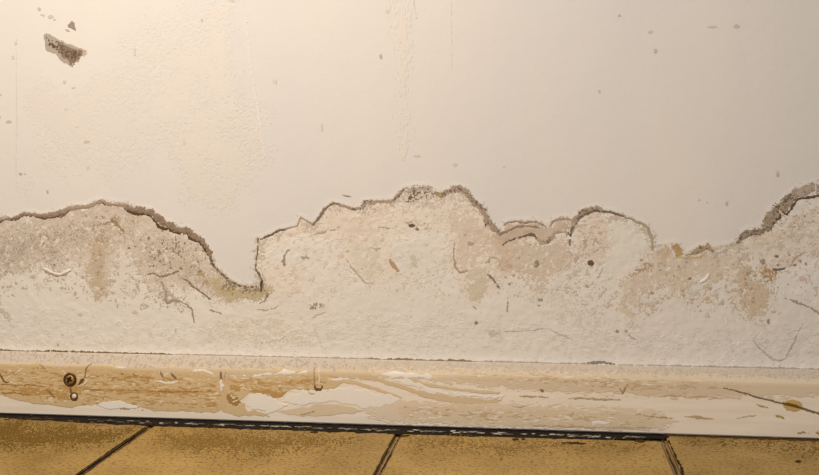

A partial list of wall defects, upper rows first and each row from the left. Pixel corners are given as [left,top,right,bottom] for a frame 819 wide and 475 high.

spalling [44,33,86,67]
crack [0,210,70,223]
spalling [1,214,216,308]
crack [145,268,221,323]
crack [99,195,351,311]
leakage [0,179,819,394]
crack [453,209,654,340]
peeling [641,207,819,320]
crack [772,251,809,271]
crack [0,298,819,370]
leakage [0,367,339,411]